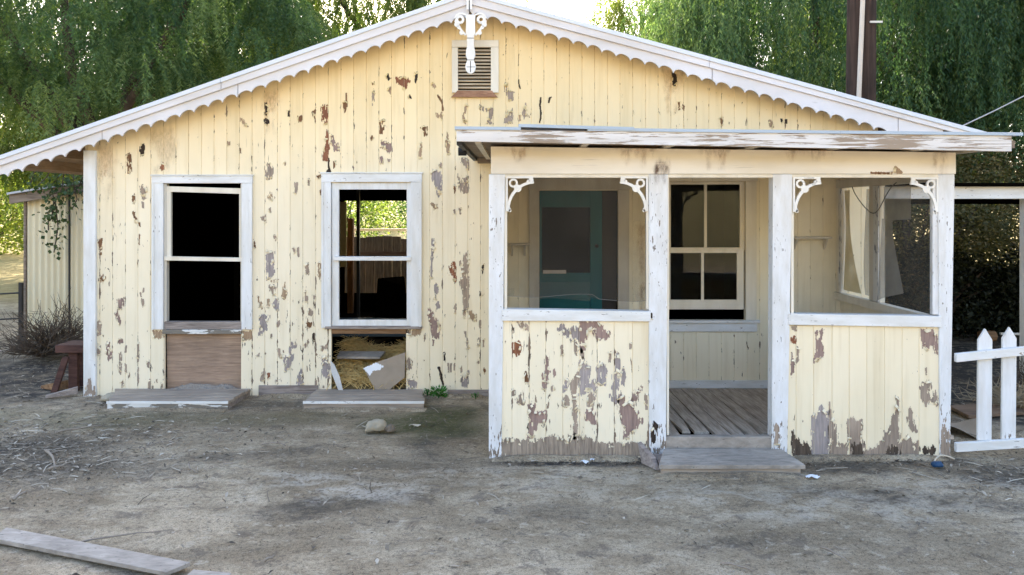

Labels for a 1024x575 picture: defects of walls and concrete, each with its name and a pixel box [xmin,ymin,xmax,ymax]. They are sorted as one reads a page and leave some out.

peeling [371,72,418,106]
peeling [126,143,145,174]
peeling [287,104,340,169]
peeling [370,118,393,164]
peeling [430,133,469,210]
peeling [97,298,151,389]
peeling [241,235,331,385]
peeling [406,238,486,389]
peeling [813,328,824,364]
peeling [921,328,938,355]
peeling [501,321,659,457]
peeling [811,367,939,455]